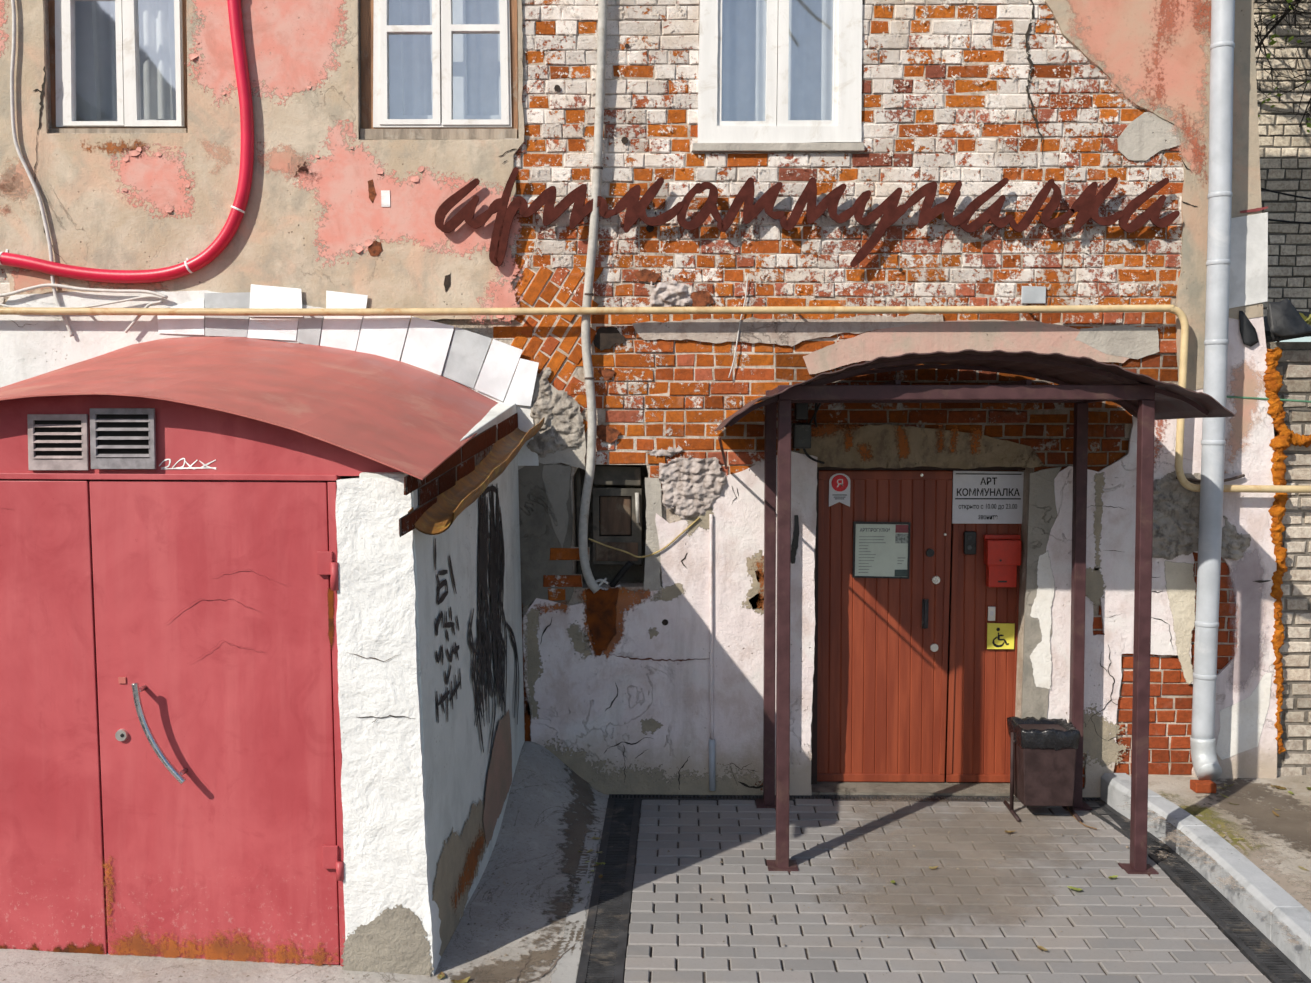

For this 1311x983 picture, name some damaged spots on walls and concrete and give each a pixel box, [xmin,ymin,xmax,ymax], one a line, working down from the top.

peeling [184,0,348,108]
crack [1025,0,1043,161]
flaking render [258,0,1211,635]
peeling [523,547,592,719]
peeling [1030,551,1055,689]
peeling [1066,654,1133,788]
flaking render [1148,552,1198,776]
flaking render [1217,557,1238,674]
corrosion [0,857,338,966]
spalling [341,710,512,977]